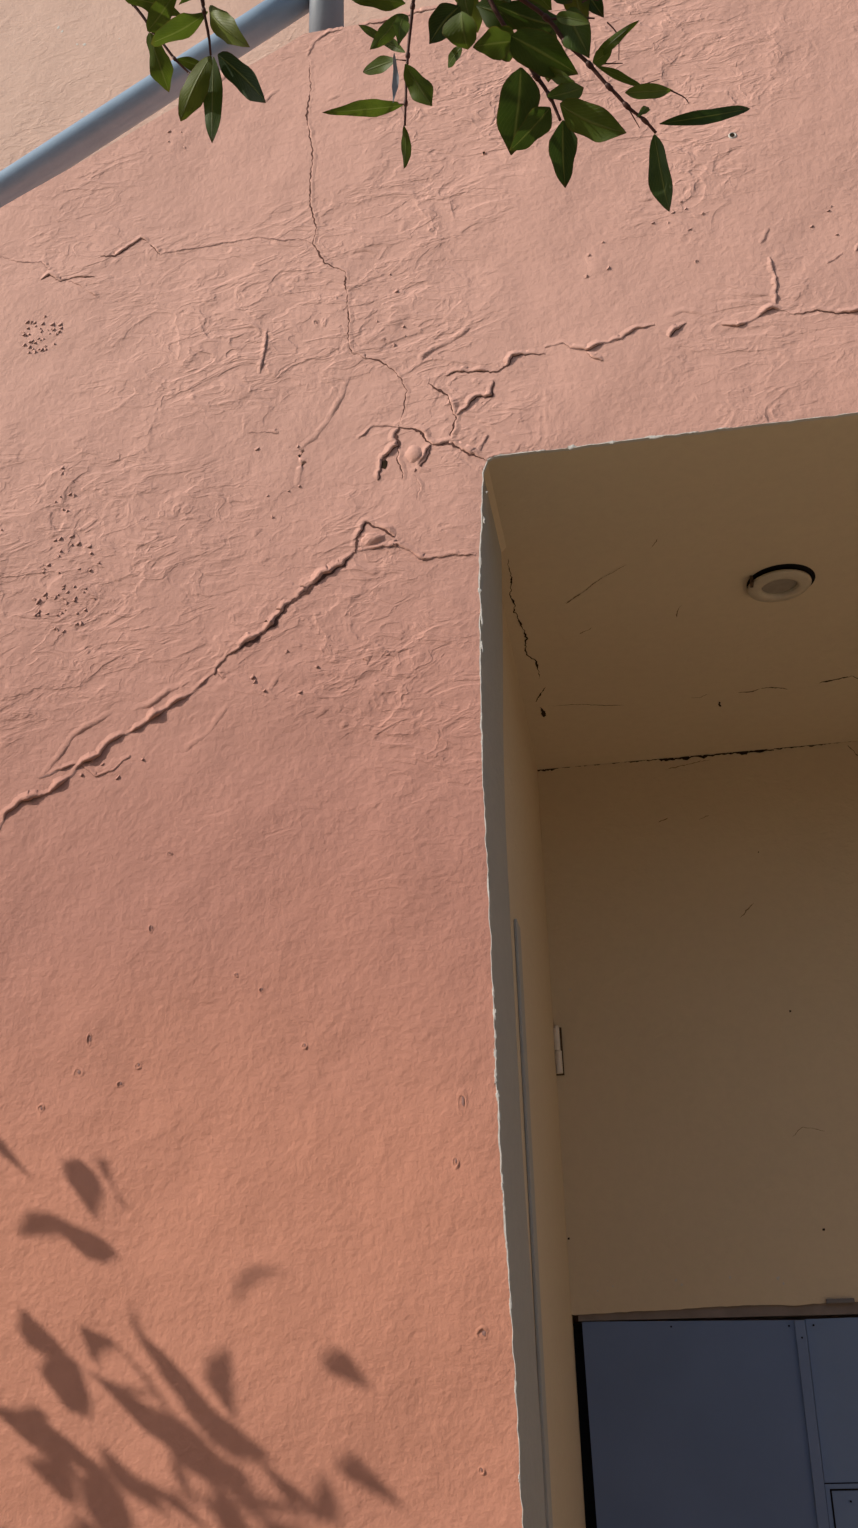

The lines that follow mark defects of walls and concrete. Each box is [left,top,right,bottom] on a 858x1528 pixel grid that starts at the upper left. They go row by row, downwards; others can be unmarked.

crack [0,0,858,828]